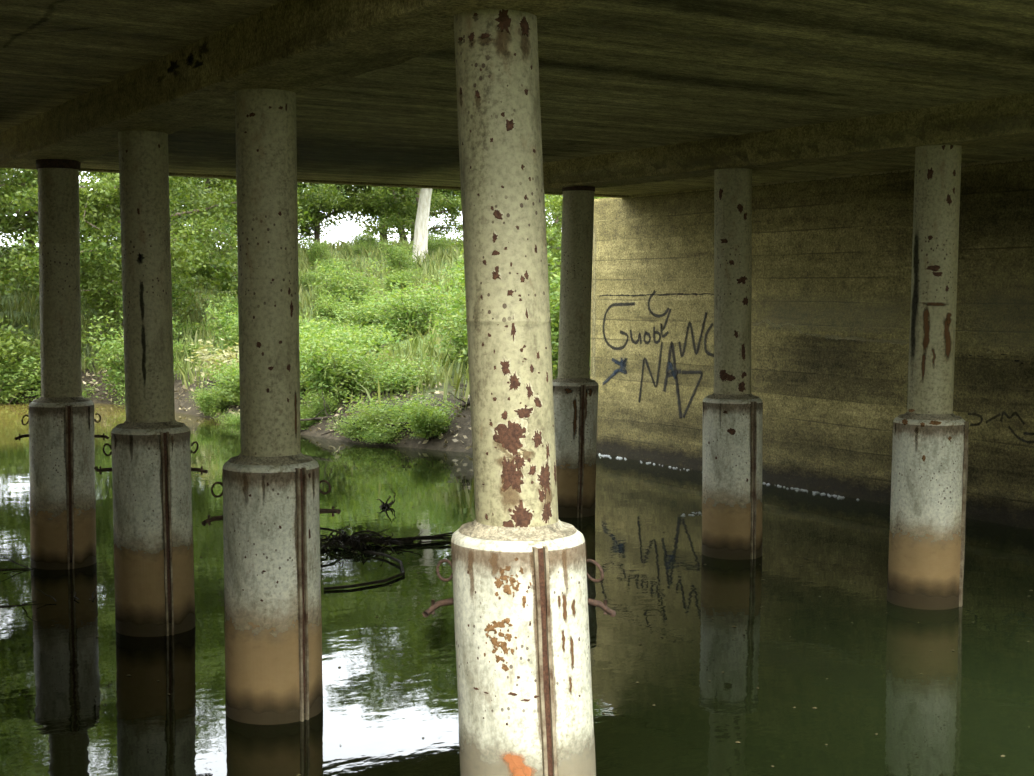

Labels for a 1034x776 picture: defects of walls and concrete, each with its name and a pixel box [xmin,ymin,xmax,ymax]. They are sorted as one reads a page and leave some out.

rust [458,26,530,56]
rust [719,370,747,381]
rust [921,302,951,380]
water stain [30,502,97,570]
water stain [113,537,195,637]
rust [497,442,533,505]
rust [450,541,587,693]
water stain [556,438,703,518]
water stain [750,412,891,505]
water stain [887,525,961,610]
water stain [966,495,1034,530]
water stain [224,609,323,725]